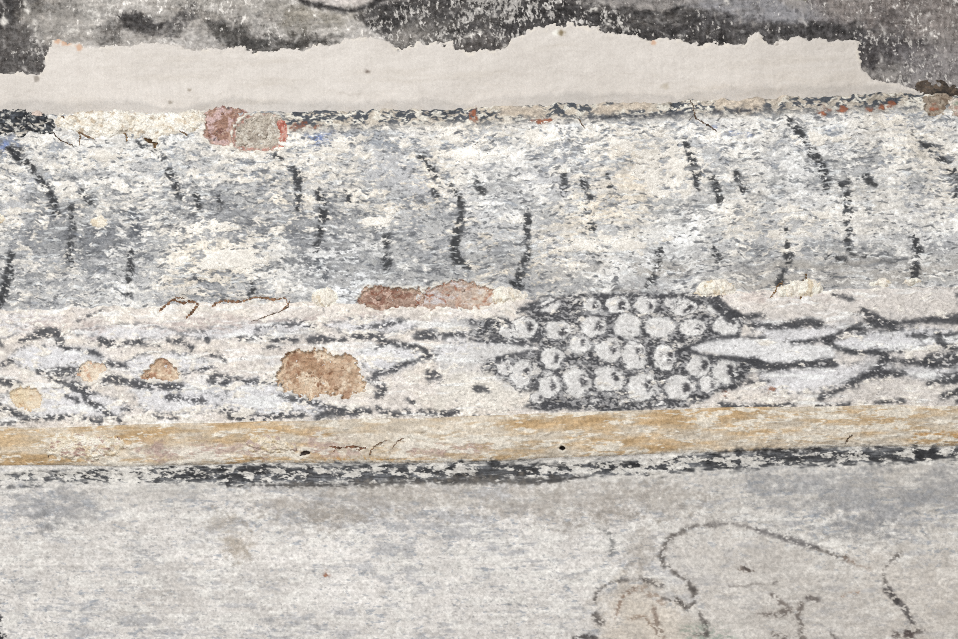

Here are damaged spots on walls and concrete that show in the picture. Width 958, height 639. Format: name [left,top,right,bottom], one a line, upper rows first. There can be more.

spalling [915,80,958,97]
spalling [0,105,248,170]
flaking render [357,279,497,311]
spalling [140,358,181,382]
spalling [275,347,367,401]